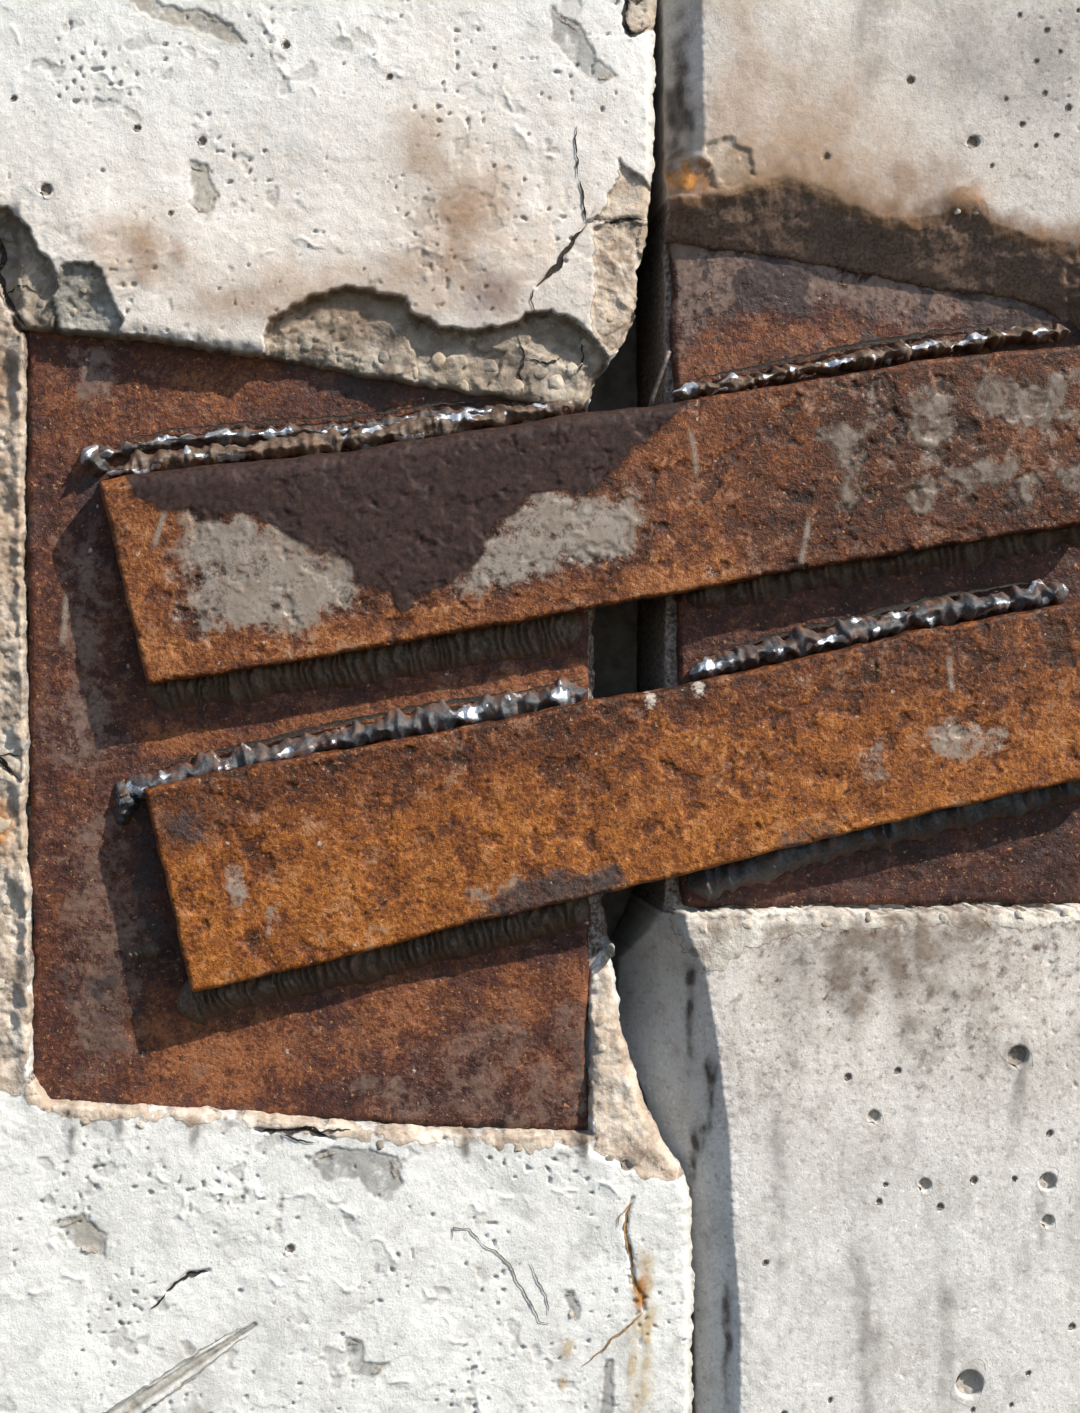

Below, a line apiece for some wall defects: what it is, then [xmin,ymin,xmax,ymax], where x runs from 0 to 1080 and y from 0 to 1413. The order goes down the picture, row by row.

crack [622,0,653,37]
spalling [264,159,651,410]
crack [517,127,647,392]
crack [0,753,21,782]
spalling [0,207,684,1197]
crack [150,1270,208,1309]
crack [452,1227,550,1324]
crack [581,1197,644,1367]
rust [629,1257,654,1401]